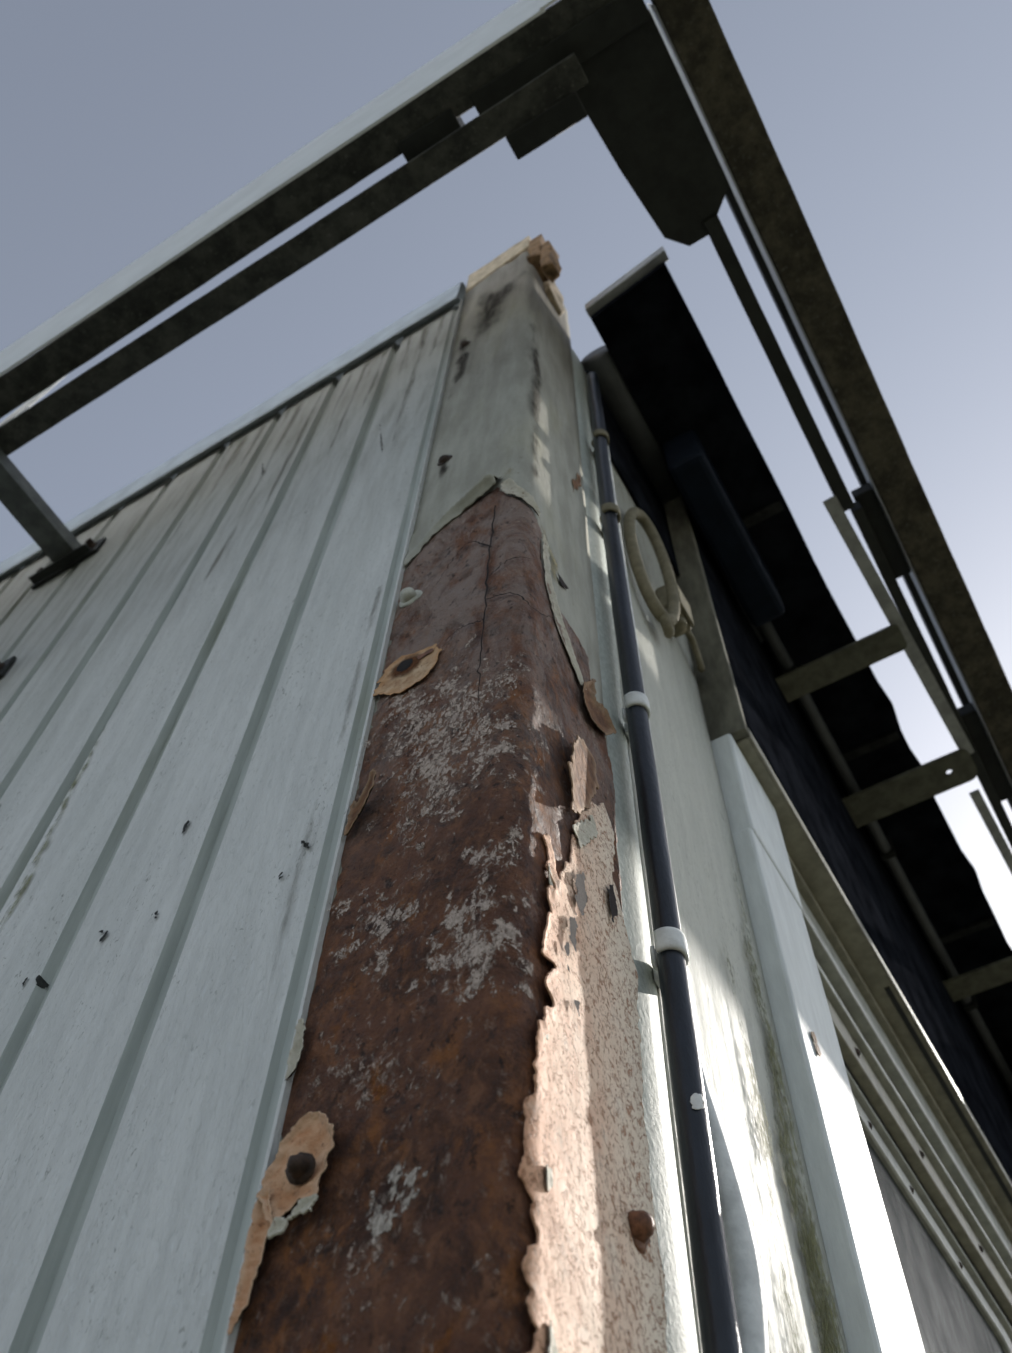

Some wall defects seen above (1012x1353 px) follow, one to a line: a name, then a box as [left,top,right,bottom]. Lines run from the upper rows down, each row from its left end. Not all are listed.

peeling [403,474,541,566]
peeling [373,643,443,696]
peeling [542,534,617,735]
corrosion [233,487,624,1353]
peeling [517,735,667,1353]